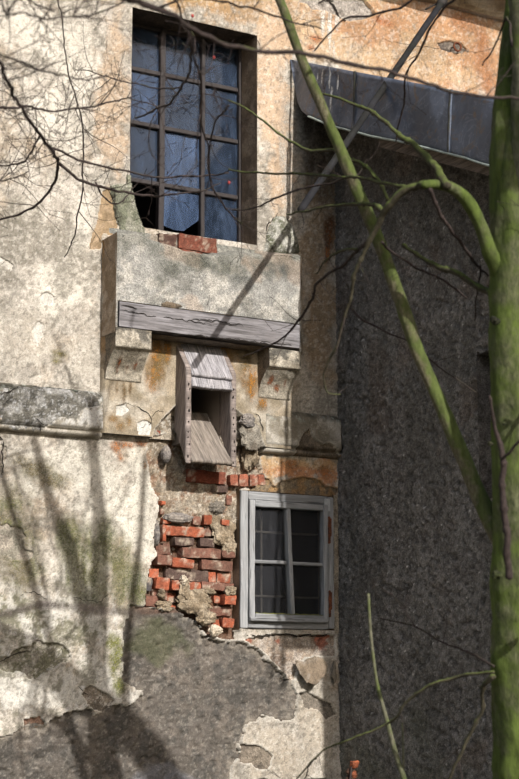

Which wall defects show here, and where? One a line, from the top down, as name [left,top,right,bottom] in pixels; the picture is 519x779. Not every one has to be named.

flaking render [299,0,373,22]
flaking render [437,41,466,54]
peeling [90,190,117,250]
peeling [0,386,100,432]
flaking render [0,413,339,779]